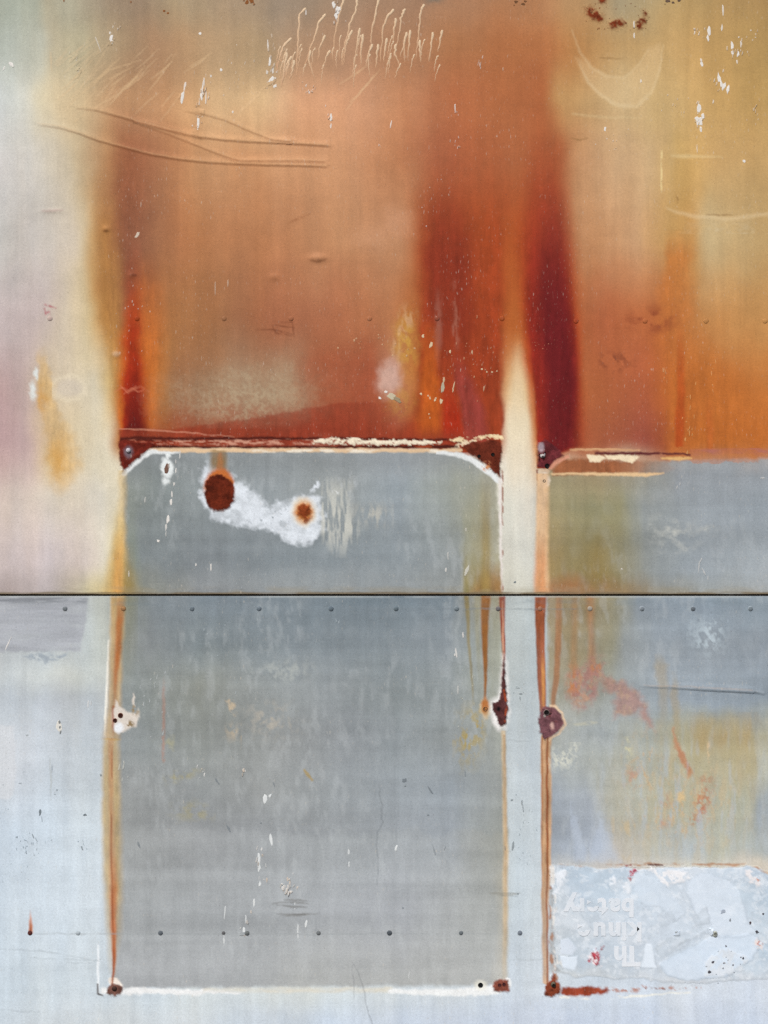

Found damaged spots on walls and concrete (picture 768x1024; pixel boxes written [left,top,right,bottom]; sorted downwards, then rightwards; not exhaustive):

peeling [266,34,278,89]
corrosion [581,0,650,33]
peeling [0,383,768,998]
corrosion [94,102,768,1001]